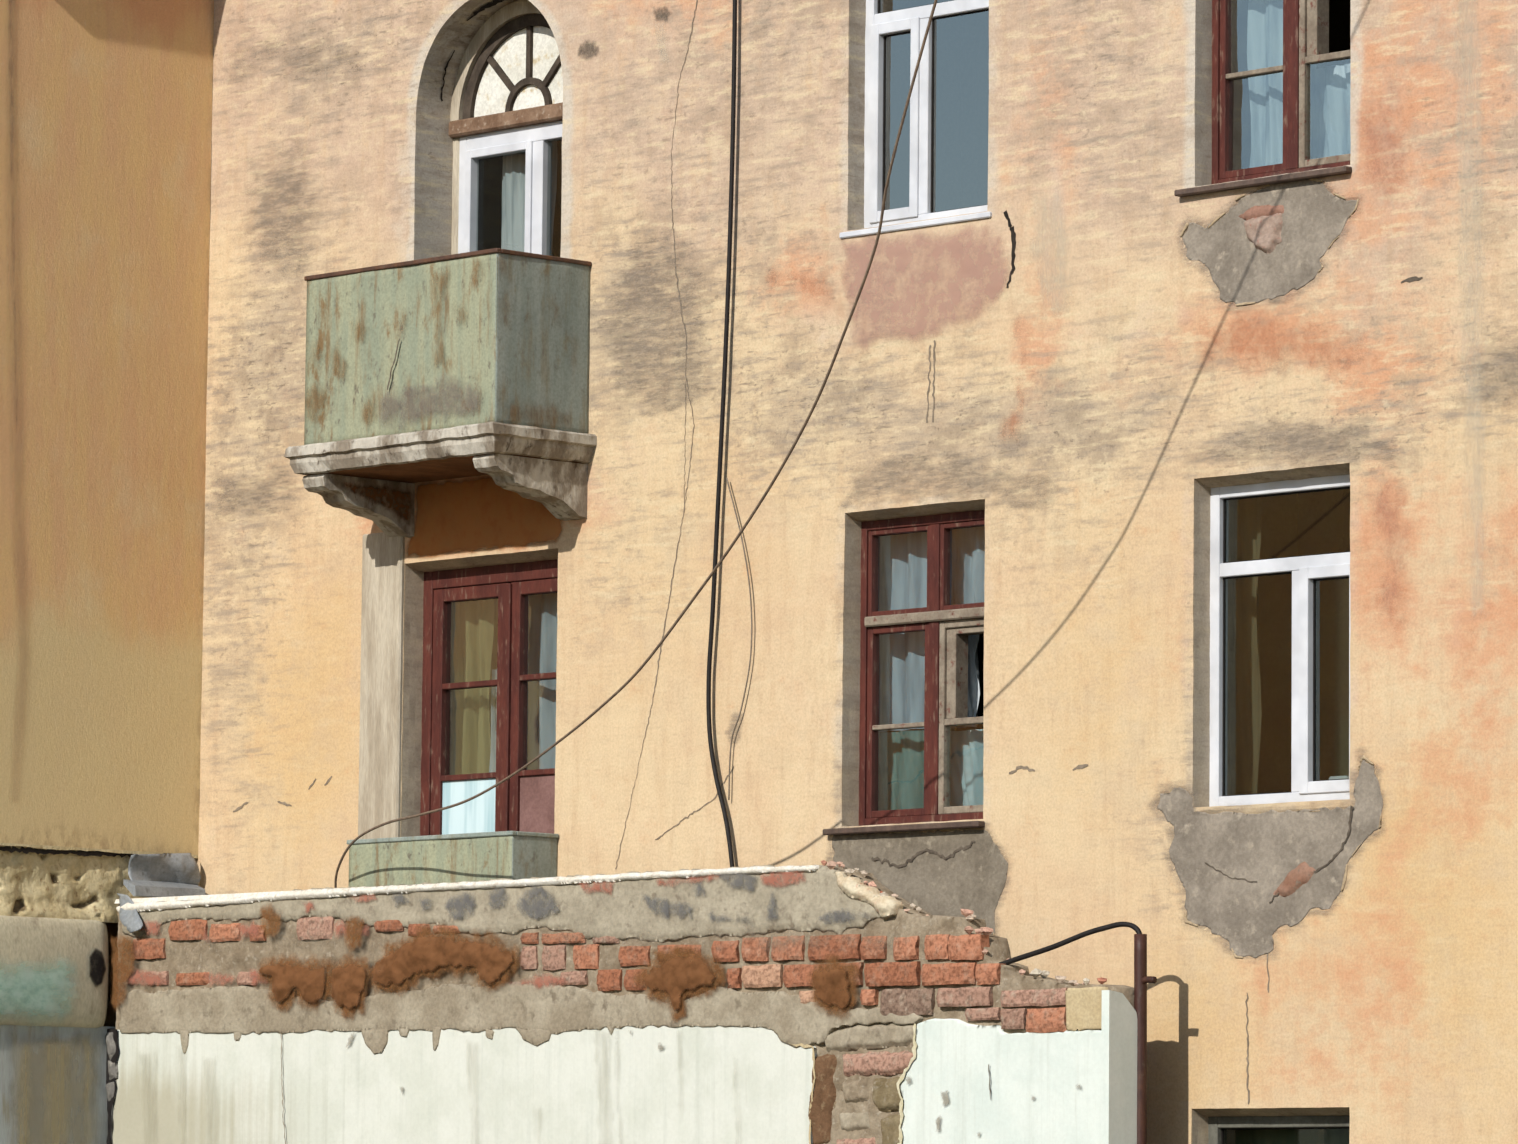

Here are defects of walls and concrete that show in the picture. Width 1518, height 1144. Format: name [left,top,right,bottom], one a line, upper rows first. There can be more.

crack [1004,210,1016,288]
spalling [1180,178,1359,306]
spalling [0,846,153,923]
spalling [832,829,1008,935]
spalling [1157,755,1383,958]
peeling [119,982,924,1144]
peeling [936,1091,949,1131]
crack [1245,953,1269,1104]